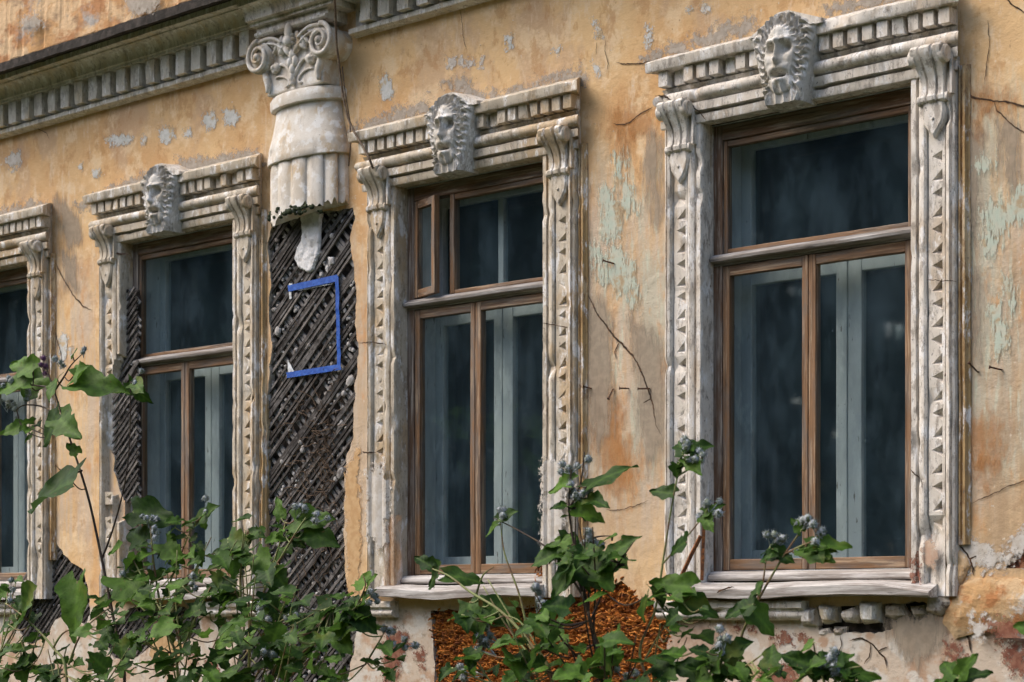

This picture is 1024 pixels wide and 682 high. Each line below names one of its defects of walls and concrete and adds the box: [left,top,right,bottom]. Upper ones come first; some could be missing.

peeling [104,106,241,148]
peeling [377,73,394,102]
peeling [971,148,998,175]
crack [970,24,1024,133]
peeling [588,145,641,315]
peeling [977,182,1024,367]
crack [588,295,661,434]
spalling [257,208,393,647]
peeling [953,523,1024,585]
spalling [238,620,357,682]